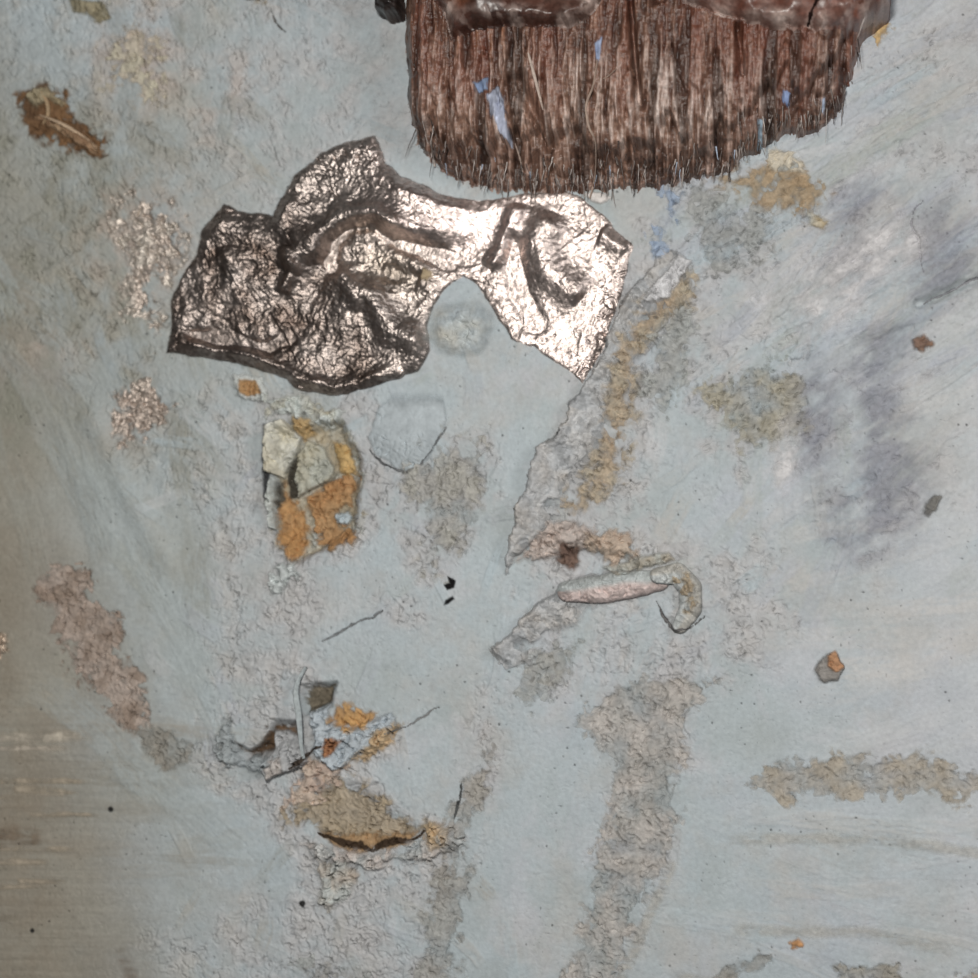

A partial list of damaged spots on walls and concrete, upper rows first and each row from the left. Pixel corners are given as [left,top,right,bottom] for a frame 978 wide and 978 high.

spalling [14,82,107,159]
spalling [233,374,366,594]
peeling [518,520,702,634]
peeling [34,562,193,771]
peeling [212,720,350,809]
peeling [560,673,718,978]
peeling [751,751,978,808]
peeling [833,963,901,978]